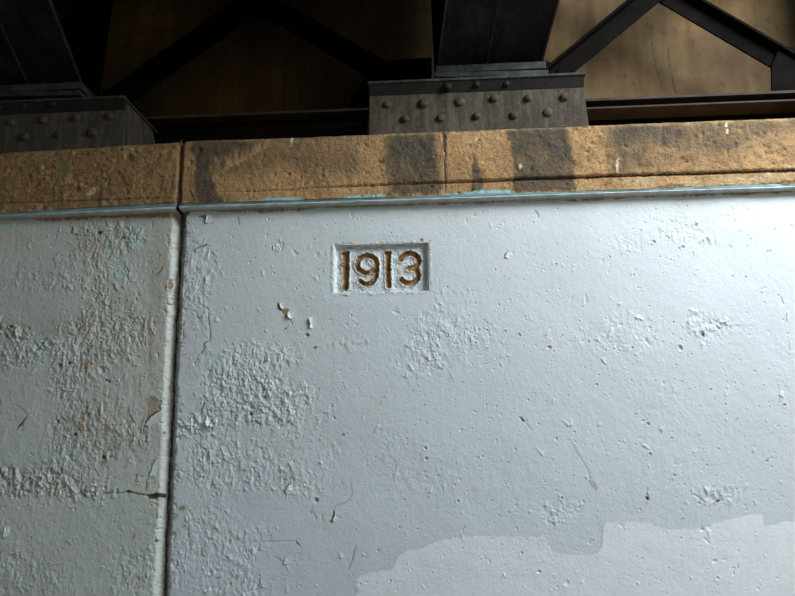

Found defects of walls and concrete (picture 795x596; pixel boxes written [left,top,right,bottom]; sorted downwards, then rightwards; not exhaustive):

leakage [169,132,442,232]
leakage [501,127,577,185]
crack [104,458,158,495]